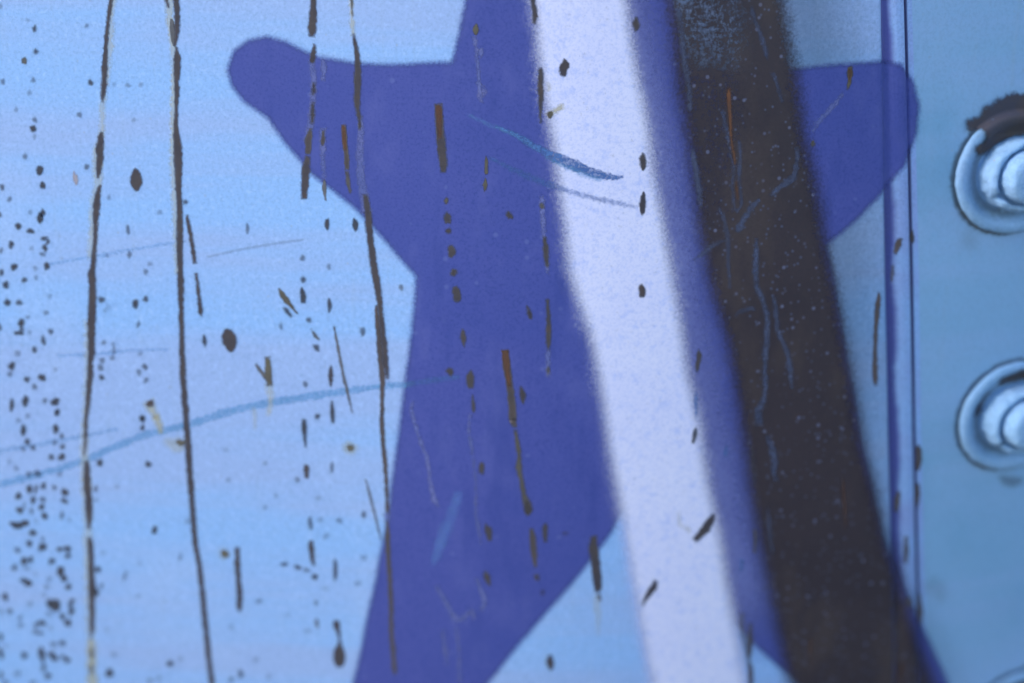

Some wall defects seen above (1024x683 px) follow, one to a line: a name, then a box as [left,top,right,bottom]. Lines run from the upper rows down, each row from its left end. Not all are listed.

corrosion [434,103,448,173]
corrosion [15,210,50,270]
corrosion [0,264,27,305]
corrosion [10,374,46,412]
corrosion [49,398,65,460]
corrosion [501,349,533,515]
corrosion [9,472,74,626]
corrosion [529,528,539,581]
corrosion [588,535,602,601]
corrosion [22,641,70,683]